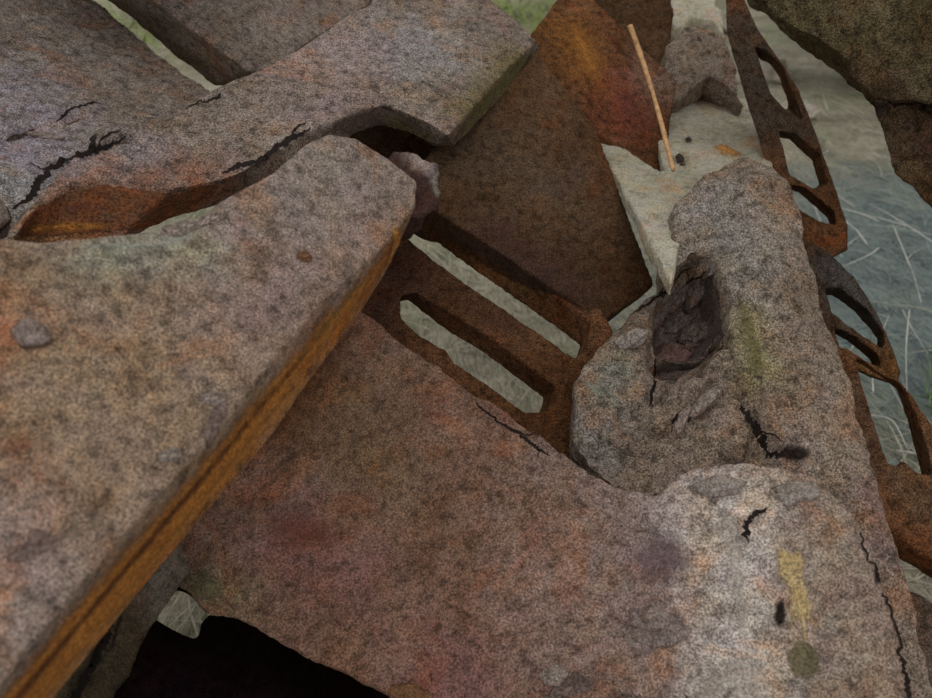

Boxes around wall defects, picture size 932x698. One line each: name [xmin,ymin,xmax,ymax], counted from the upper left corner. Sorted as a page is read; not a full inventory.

crack [187,92,221,108]
crack [12,101,126,210]
crack [222,121,311,174]
crack [472,398,550,457]
crack [738,399,791,459]
crack [740,507,768,542]
crack [859,528,878,568]
crack [882,592,912,698]